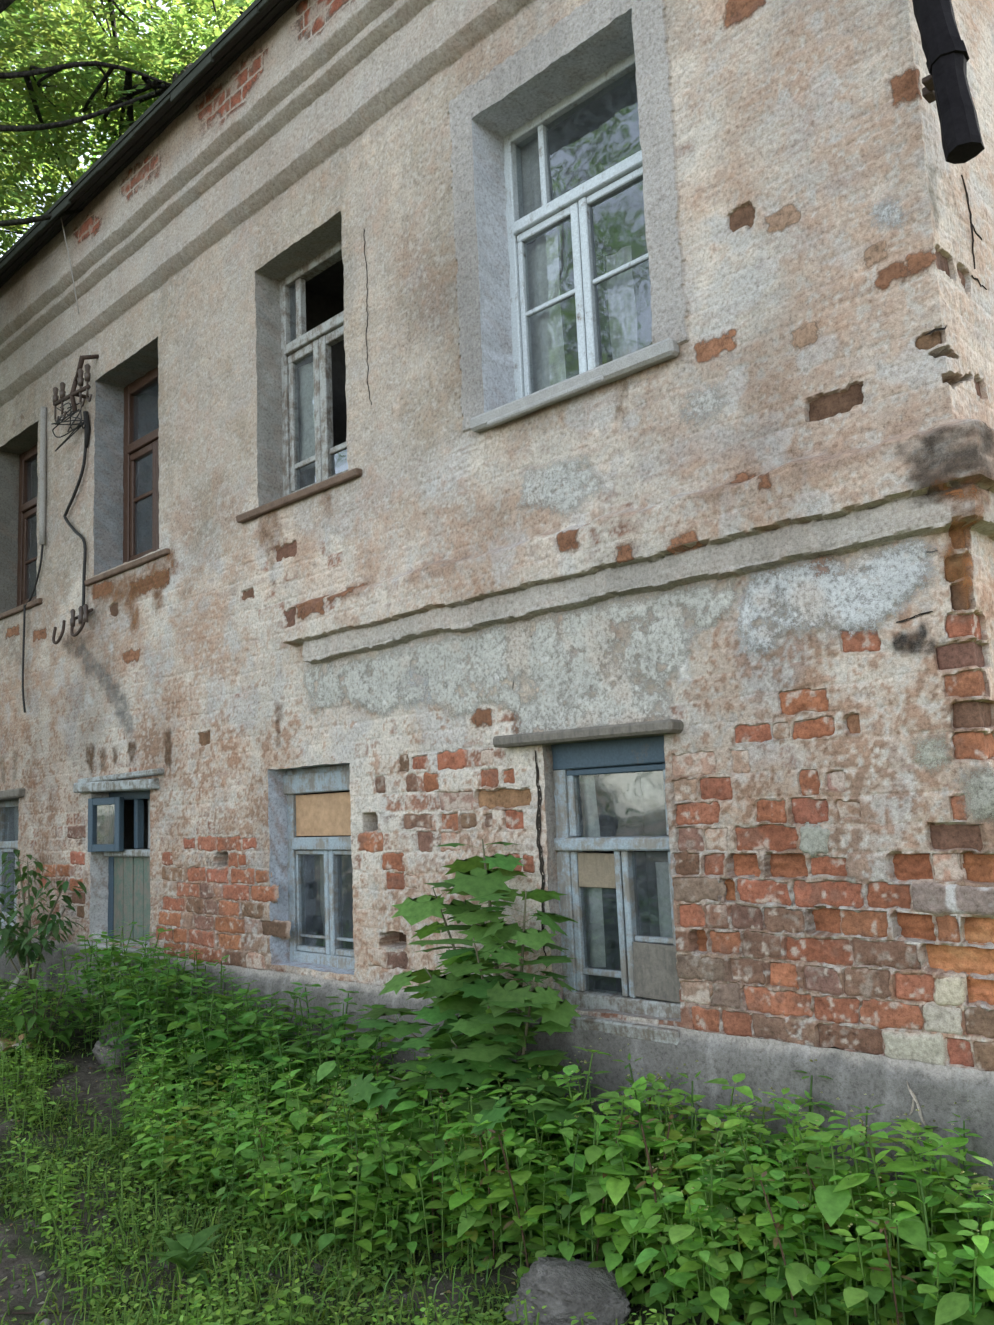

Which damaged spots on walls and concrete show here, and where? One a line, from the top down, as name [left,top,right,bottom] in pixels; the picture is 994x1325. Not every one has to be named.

spalling [723,0,766,28]
crack [363,229,372,405]
spalling [864,241,965,290]
spalling [915,331,942,350]
crack [961,175,987,290]
spalling [809,384,864,422]
leakage [908,424,994,498]
spalling [156,835,291,970]
spalling [367,933,409,969]
spalling [358,749,535,889]
crack [535,750,547,968]
spalling [672,689,994,1071]